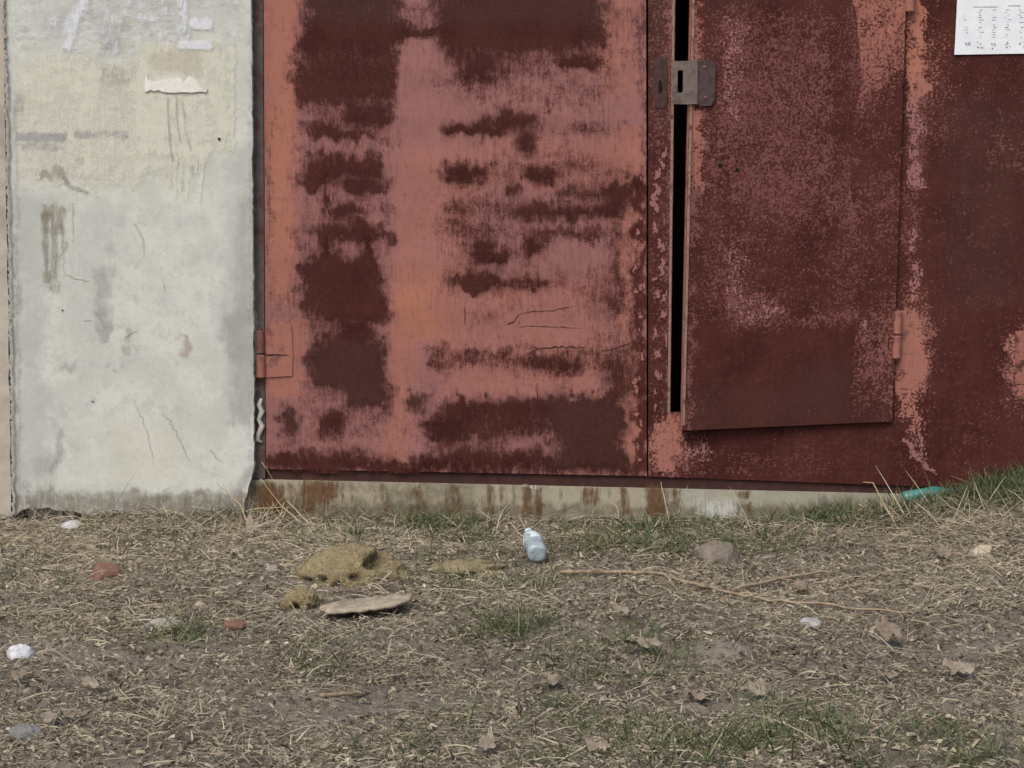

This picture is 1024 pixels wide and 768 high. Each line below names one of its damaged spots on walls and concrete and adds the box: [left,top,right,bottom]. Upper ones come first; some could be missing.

leakage [41,205,73,289]
crack [136,406,222,462]
rust [255,478,344,518]
rust [487,485,542,518]
rust [645,485,679,518]